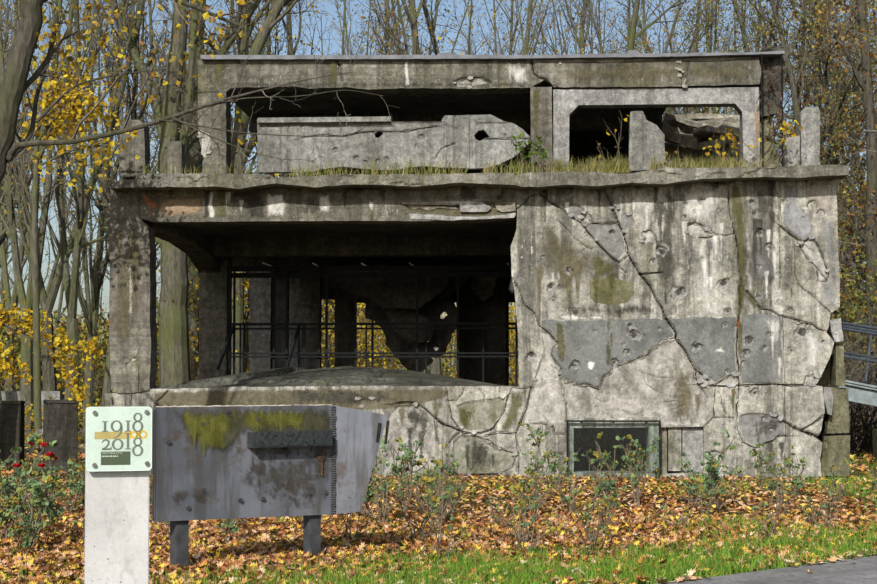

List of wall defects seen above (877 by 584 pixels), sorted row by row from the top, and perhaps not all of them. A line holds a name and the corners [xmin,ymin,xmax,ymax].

spalling [401,201,516,221]
water stain [535,264,651,320]
crack [419,188,830,472]
water stain [614,181,735,315]
water stain [154,389,447,454]
spalling [525,332,740,426]